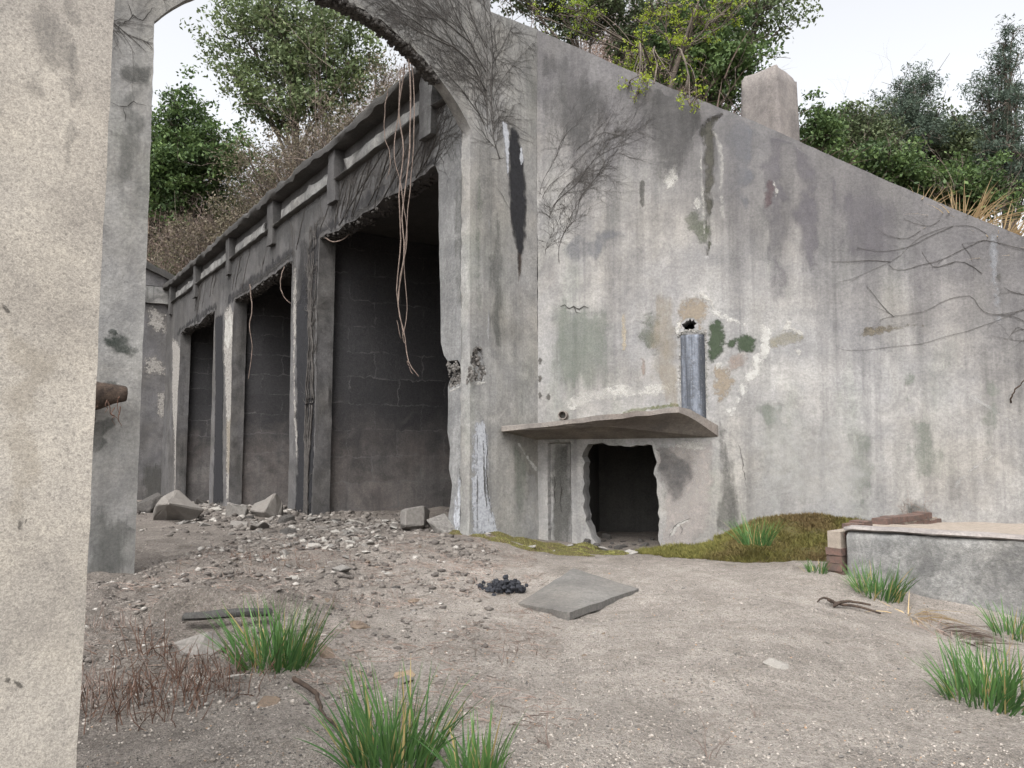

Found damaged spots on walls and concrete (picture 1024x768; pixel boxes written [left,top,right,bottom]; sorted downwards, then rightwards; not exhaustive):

water stain [502,122,527,271]
water stain [689,212,709,242]
spalling [676,293,714,334]
water stain [105,330,130,354]
peeling [144,253,298,499]
spalling [446,346,486,392]